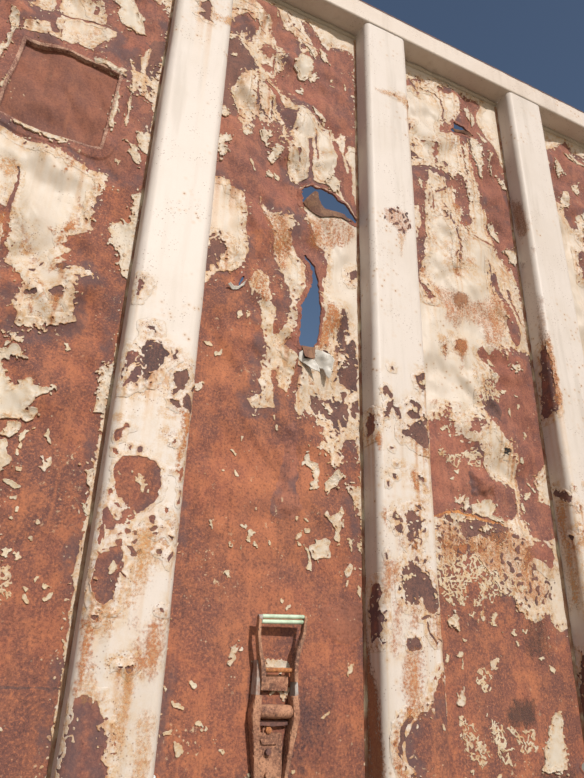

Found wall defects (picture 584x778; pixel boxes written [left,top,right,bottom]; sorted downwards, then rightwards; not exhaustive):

rust [0,159,20,232]
rust [298,129,356,216]
rust [512,202,527,236]
rust [318,302,340,348]
rust [437,287,509,343]
peeling [83,0,392,778]
spalling [362,72,584,778]
rust [113,456,161,512]
rust [74,620,93,695]
rust [134,623,164,677]
rust [366,638,408,778]
rust [402,654,422,718]